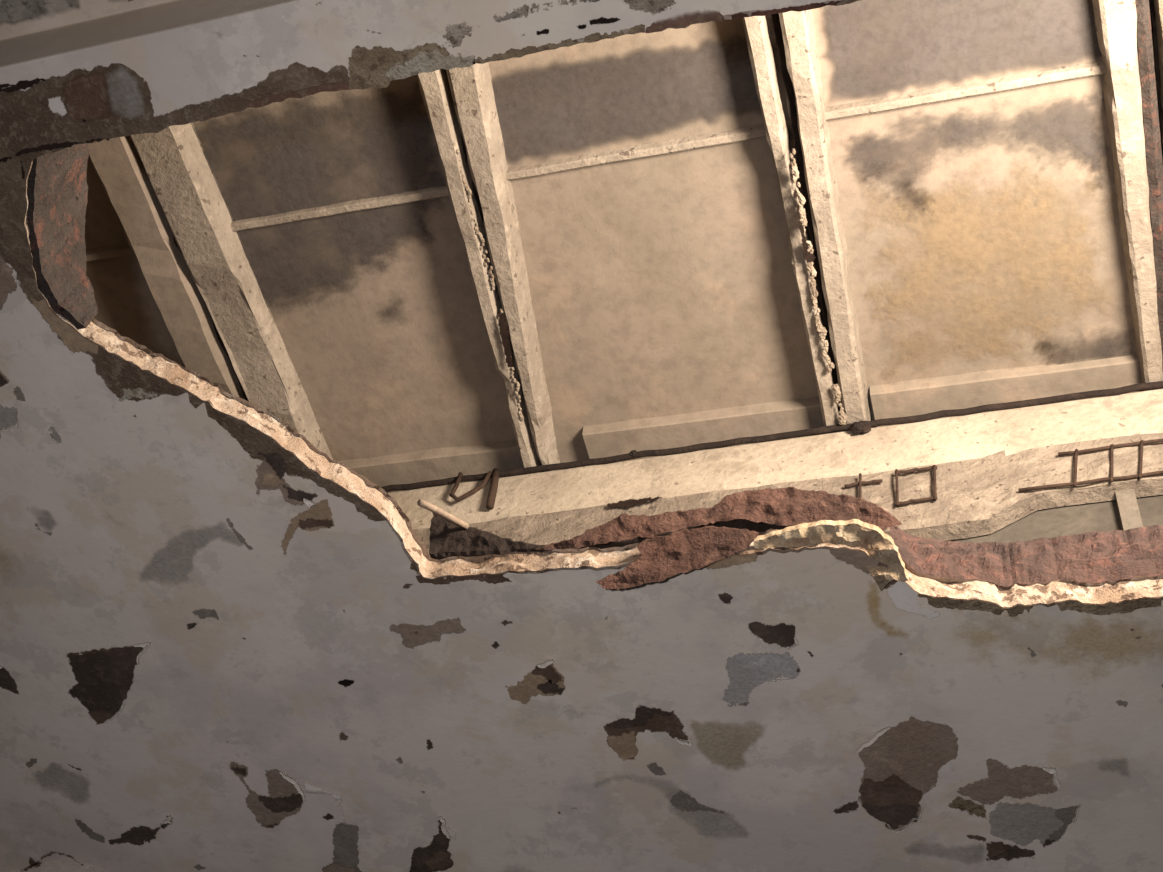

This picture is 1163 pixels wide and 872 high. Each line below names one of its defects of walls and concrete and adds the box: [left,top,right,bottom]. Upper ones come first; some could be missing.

damp [192,92,444,307]
spalling [0,12,724,555]
spalling [1018,438,1163,492]
spalling [400,537,512,588]
rust [536,487,902,590]
spalling [917,593,1163,617]
peeling [67,642,151,724]
peeling [723,621,813,706]
peeling [230,762,305,828]
peeling [604,705,692,760]
peeling [833,716,958,832]
peeling [949,759,1080,861]